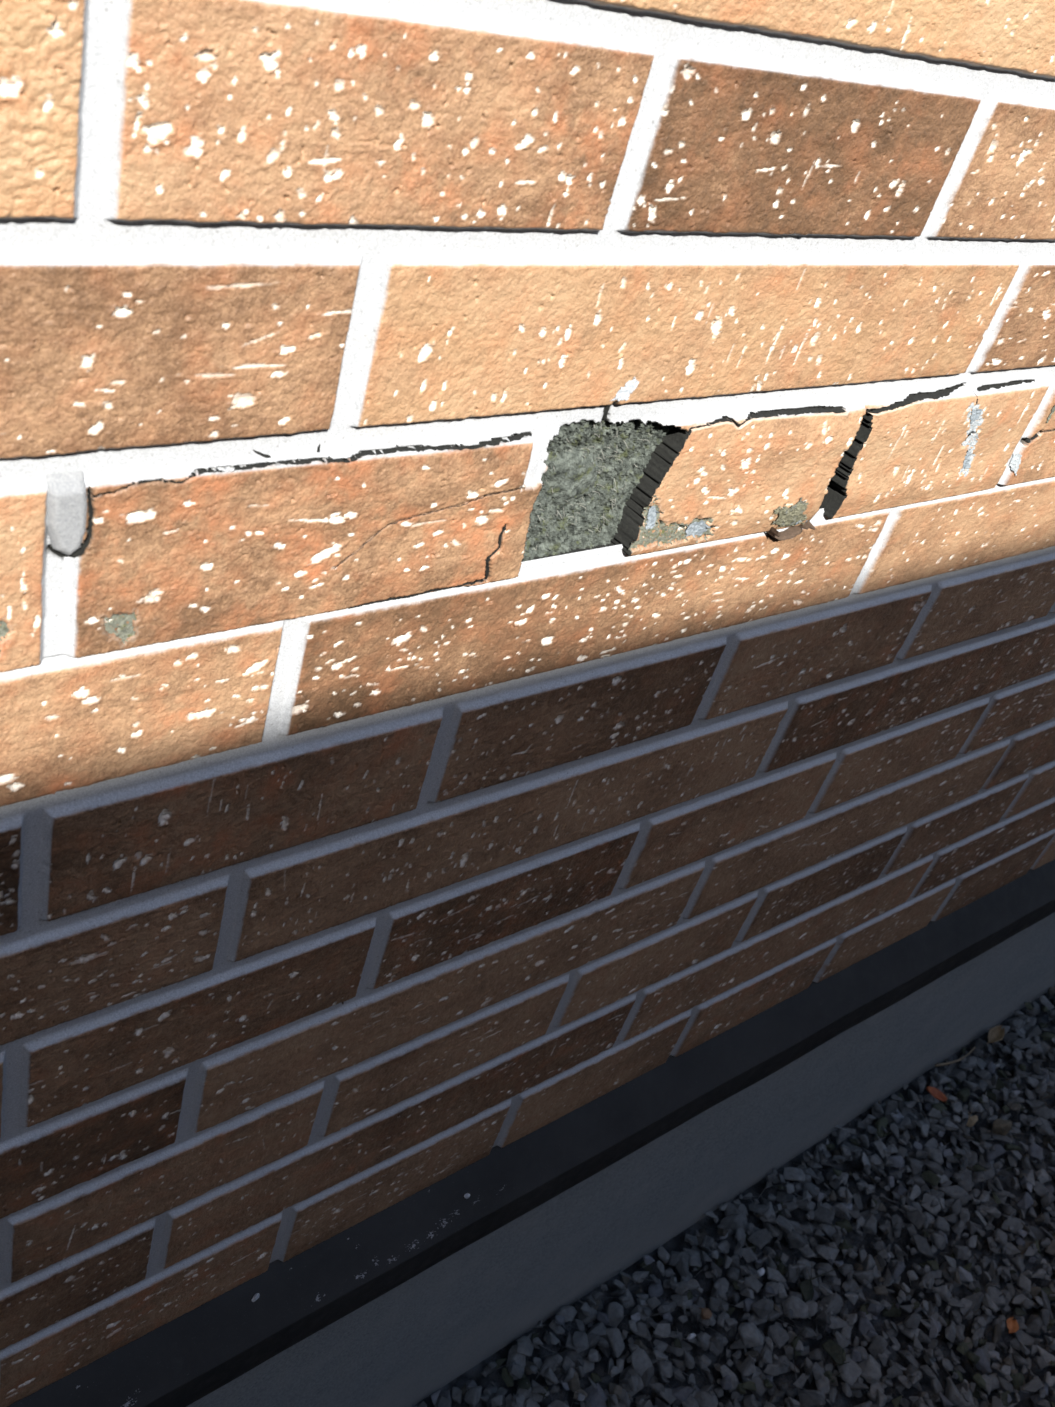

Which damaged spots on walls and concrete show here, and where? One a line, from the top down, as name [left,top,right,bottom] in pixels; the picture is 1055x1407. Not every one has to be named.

crack [92,432,532,497]
crack [334,487,525,608]
crack [602,403,615,421]
spalling [522,420,715,562]
peeling [766,497,816,540]
crack [690,380,1035,441]
crack [1022,429,1055,443]